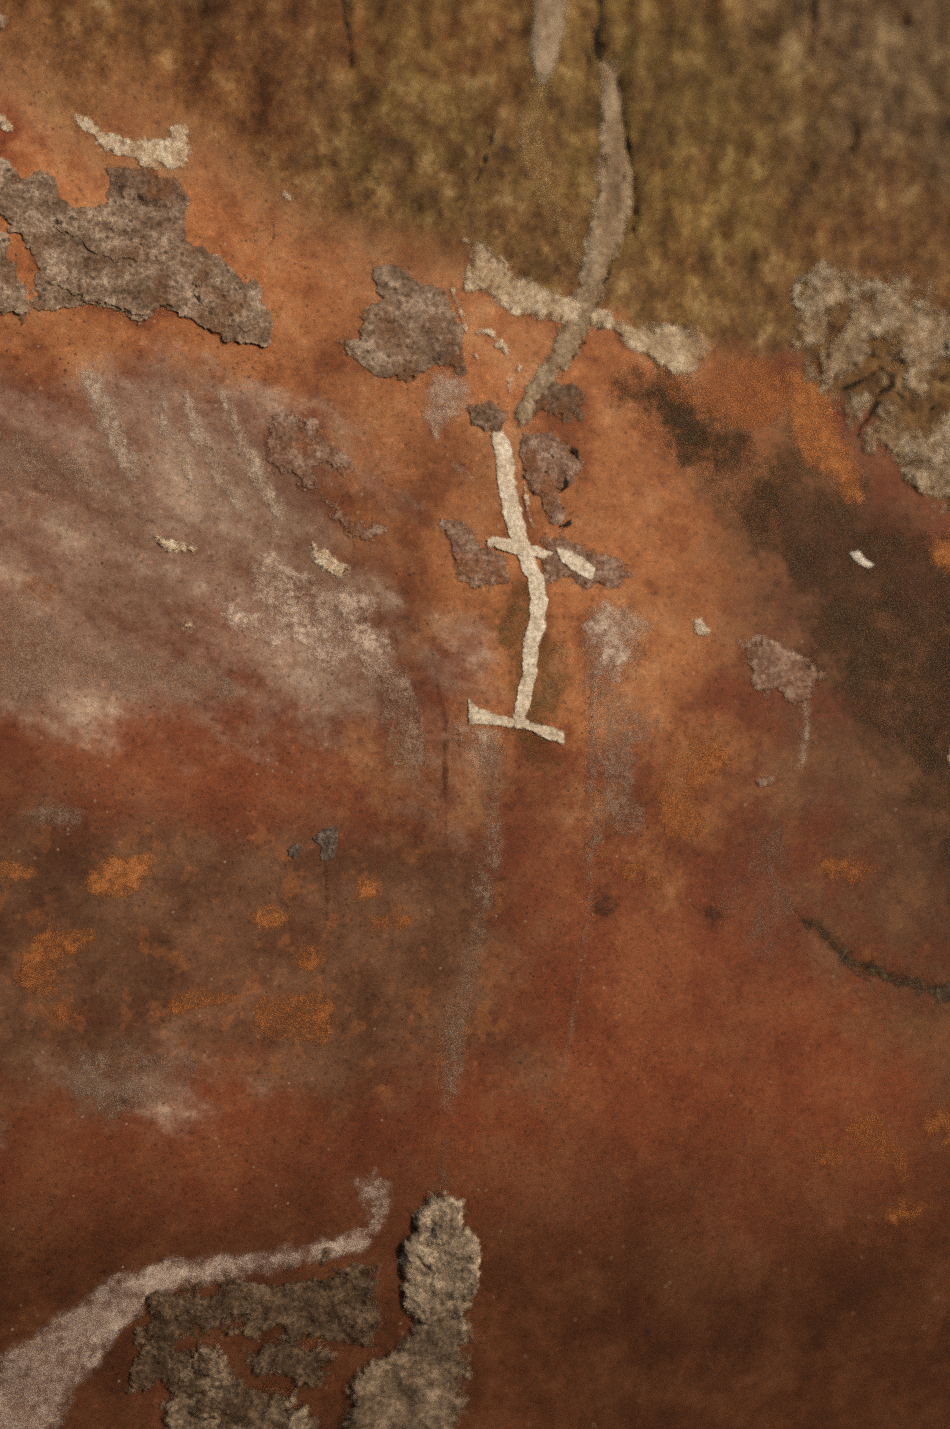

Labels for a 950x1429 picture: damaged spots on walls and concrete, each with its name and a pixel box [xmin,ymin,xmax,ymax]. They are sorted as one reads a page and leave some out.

crack [342,0,354,68]
flaking render [0,157,274,347]
spalling [789,259,950,513]
flaking render [520,381,632,589]
efflorescence [221,551,424,768]
corrosion [21,929,93,1021]
corrosion [89,854,153,895]
corrosion [255,995,335,1042]
crack [803,918,950,1003]
efflorescence [312,1233,368,1257]
efflorescence [0,1256,252,1429]
spalling [125,1247,473,1429]